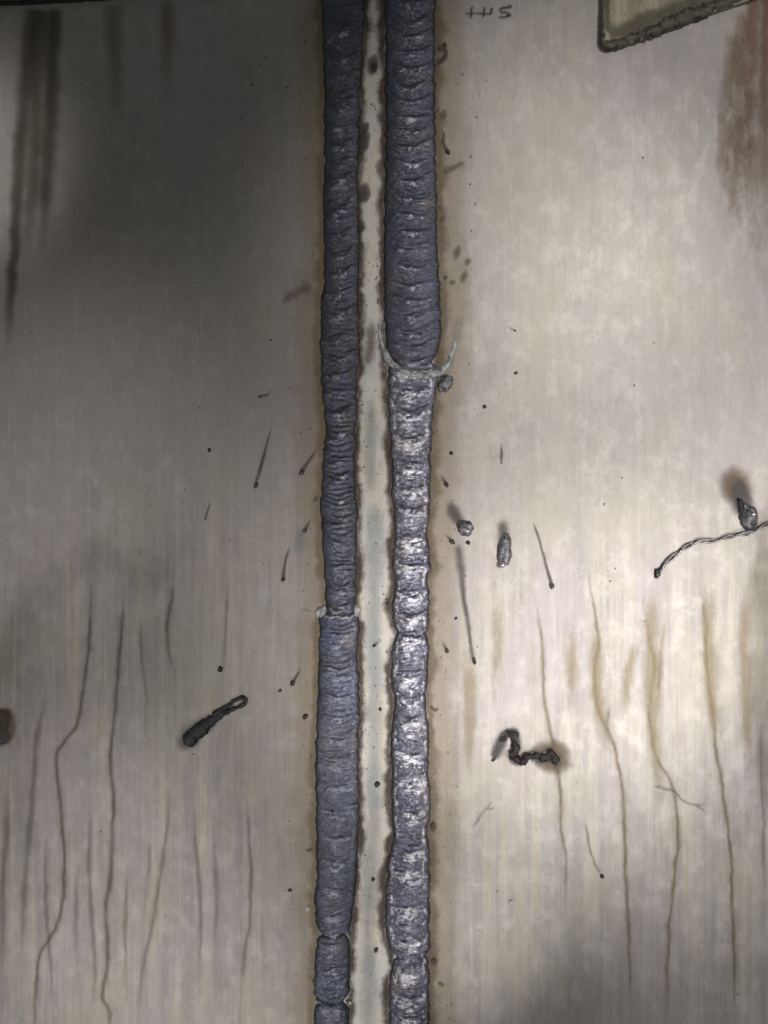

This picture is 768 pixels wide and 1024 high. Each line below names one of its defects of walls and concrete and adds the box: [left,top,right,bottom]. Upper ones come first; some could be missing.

damp [8,10,59,300]